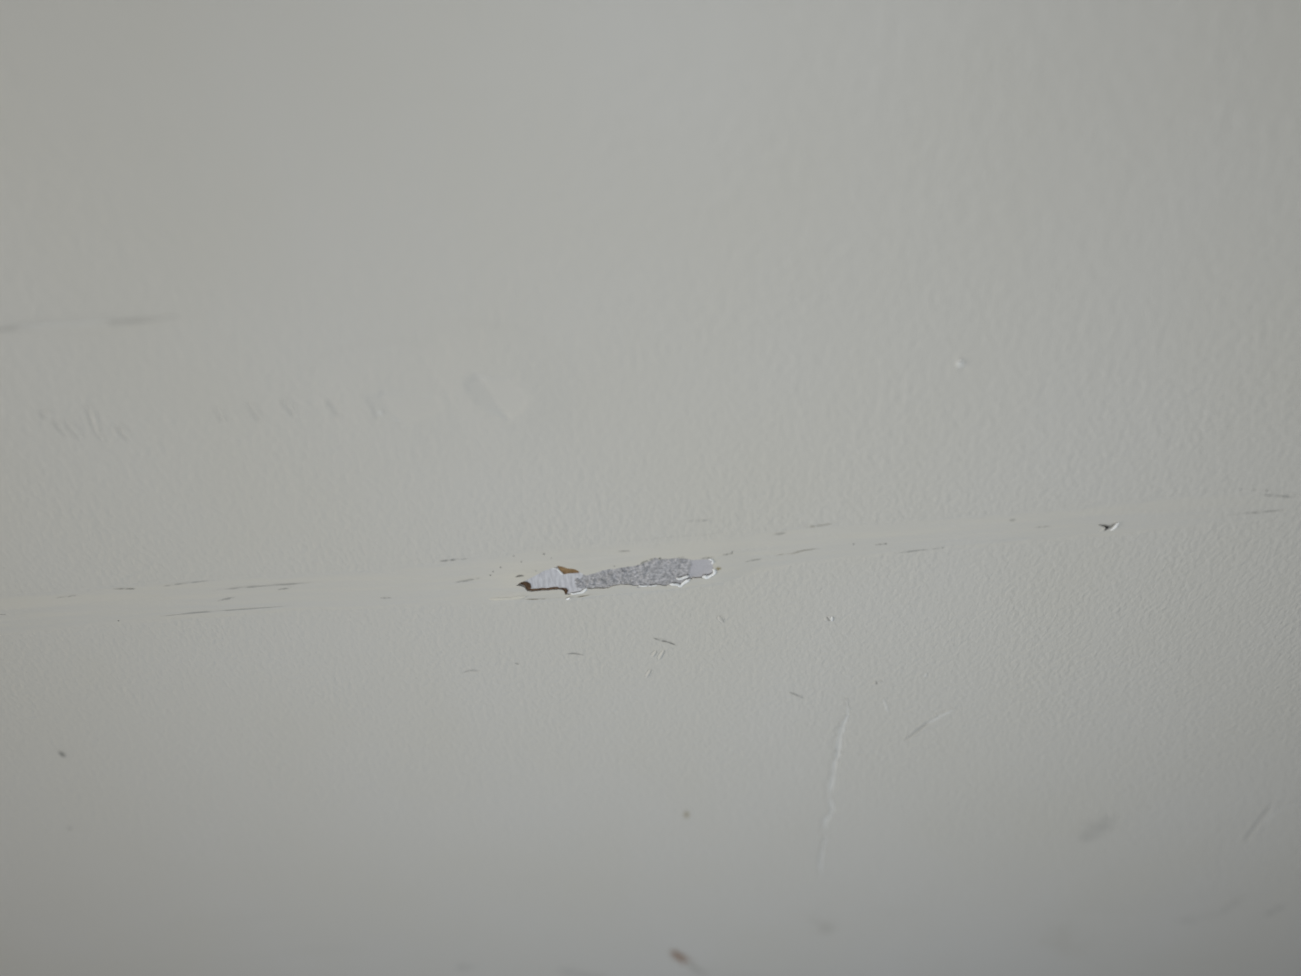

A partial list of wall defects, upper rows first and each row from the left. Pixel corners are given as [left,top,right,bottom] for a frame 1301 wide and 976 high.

peeling [516,558,723,600]